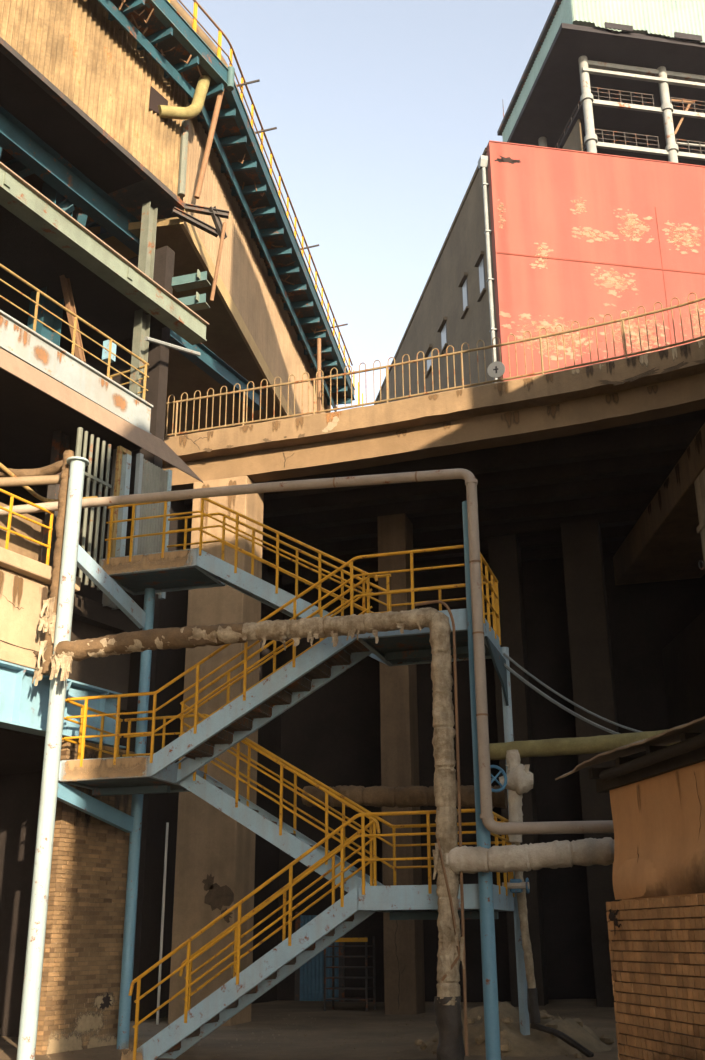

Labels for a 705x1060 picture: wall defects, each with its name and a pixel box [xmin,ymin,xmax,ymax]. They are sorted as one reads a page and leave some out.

peeling [570,197,702,254]
peeling [529,242,553,269]
peeling [499,266,705,360]
rust [0,316,62,364]
rust [101,379,139,411]